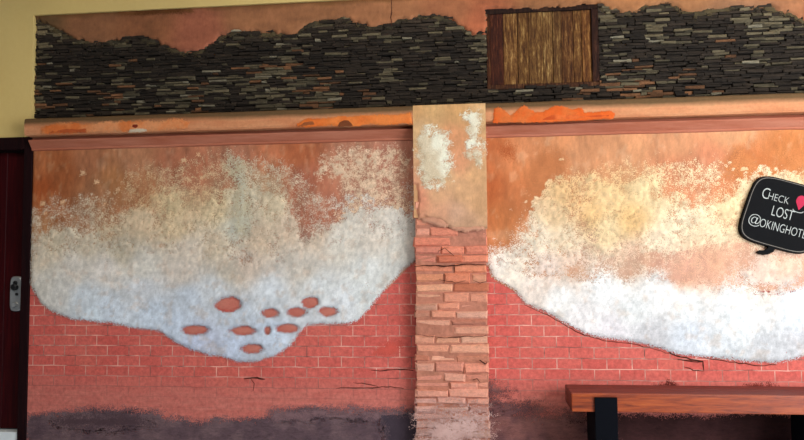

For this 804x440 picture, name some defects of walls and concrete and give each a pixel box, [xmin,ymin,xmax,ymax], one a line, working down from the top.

flaking render [34,2,804,169]
leakage [516,146,570,217]
peeling [29,124,804,440]
leakage [26,374,587,440]
crack [336,369,413,389]
leakage [618,412,792,440]